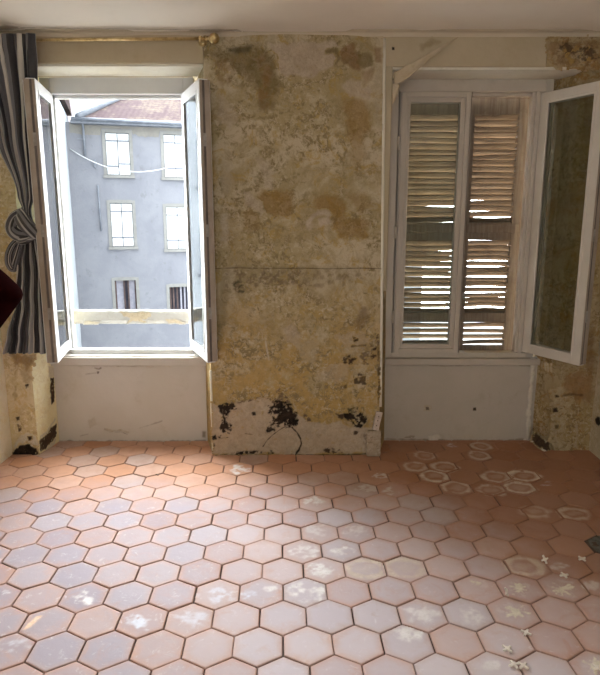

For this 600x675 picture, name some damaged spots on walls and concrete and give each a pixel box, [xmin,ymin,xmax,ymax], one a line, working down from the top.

water stain [545,34,600,72]
water stain [205,38,283,116]
water stain [239,186,297,234]
water stain [311,186,379,241]
spalling [47,364,55,405]
spalling [12,418,57,455]
spalling [210,397,373,456]
water stain [226,464,252,475]
water stain [401,450,553,497]
water stain [171,544,431,632]
water stain [123,613,153,633]
water stain [387,604,444,647]